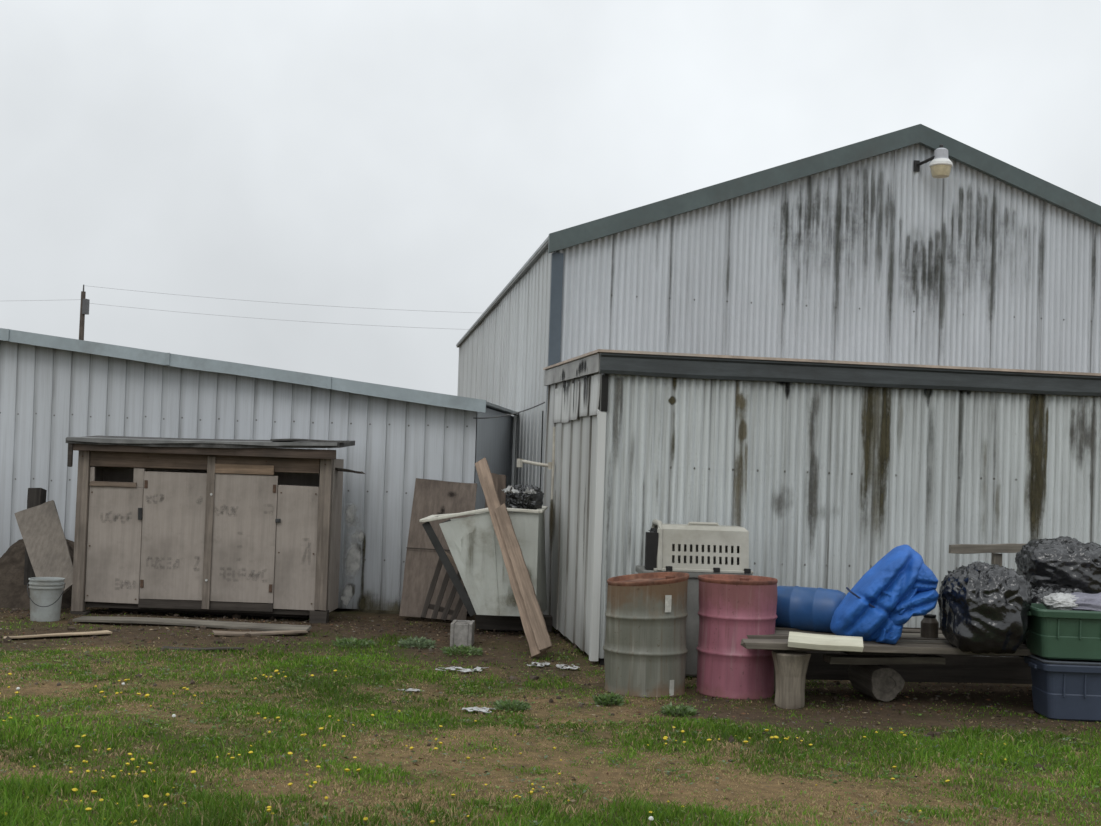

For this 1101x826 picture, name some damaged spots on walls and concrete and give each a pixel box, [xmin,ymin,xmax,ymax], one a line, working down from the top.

leakage [808,176,848,289]
leakage [863,173,894,313]
leakage [907,190,979,322]
leakage [736,388,747,523]
leakage [809,399,819,521]
leakage [861,387,891,526]
leakage [1029,394,1048,538]